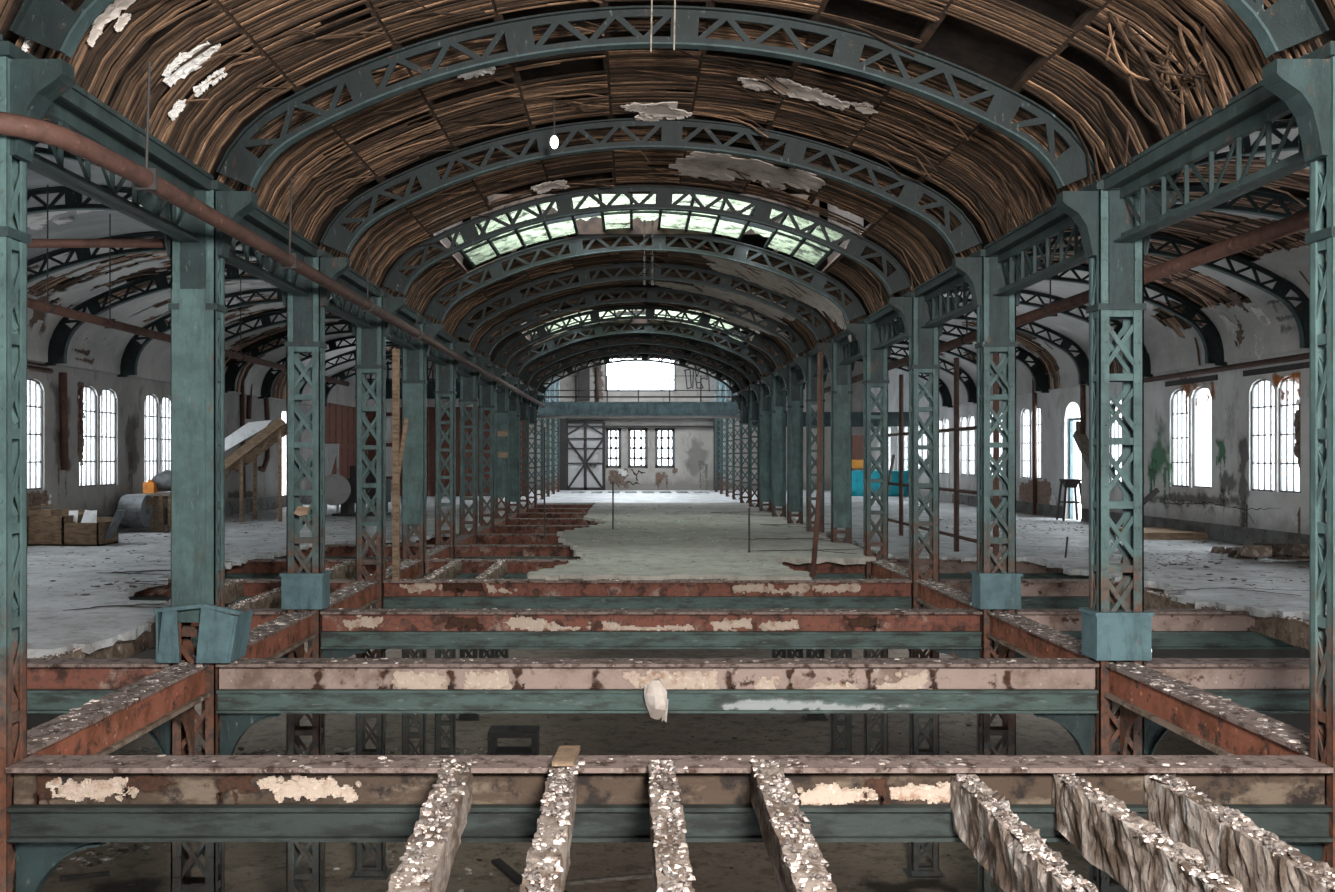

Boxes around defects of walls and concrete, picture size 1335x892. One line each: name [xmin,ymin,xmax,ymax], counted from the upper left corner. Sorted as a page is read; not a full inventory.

peeling [87,0,136,47]
peeling [162,41,227,121]
peeling [738,77,878,114]
peeling [669,151,826,193]
rust [442,583,484,596]
rust [445,616,484,631]
rust [843,615,880,631]
peeling [46,777,139,802]
peeling [257,774,362,803]